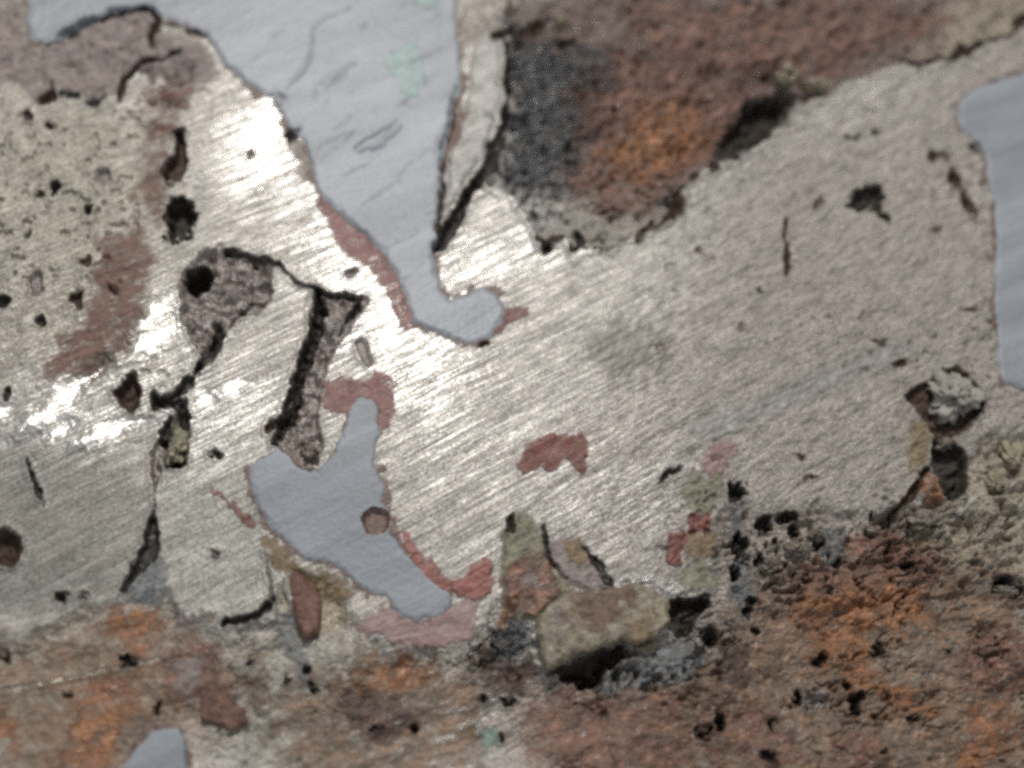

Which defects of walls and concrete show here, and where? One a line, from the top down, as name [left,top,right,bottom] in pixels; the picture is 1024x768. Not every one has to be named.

peeling [19,0,529,347]
crack [433,19,550,254]
corrosion [487,0,1024,253]
peeling [955,70,1024,391]
crack [110,369,201,593]
peeling [122,700,193,768]
peeling [177,243,494,649]
corrosion [0,424,1024,768]
peeling [535,584,670,672]
hole [699,625,718,648]